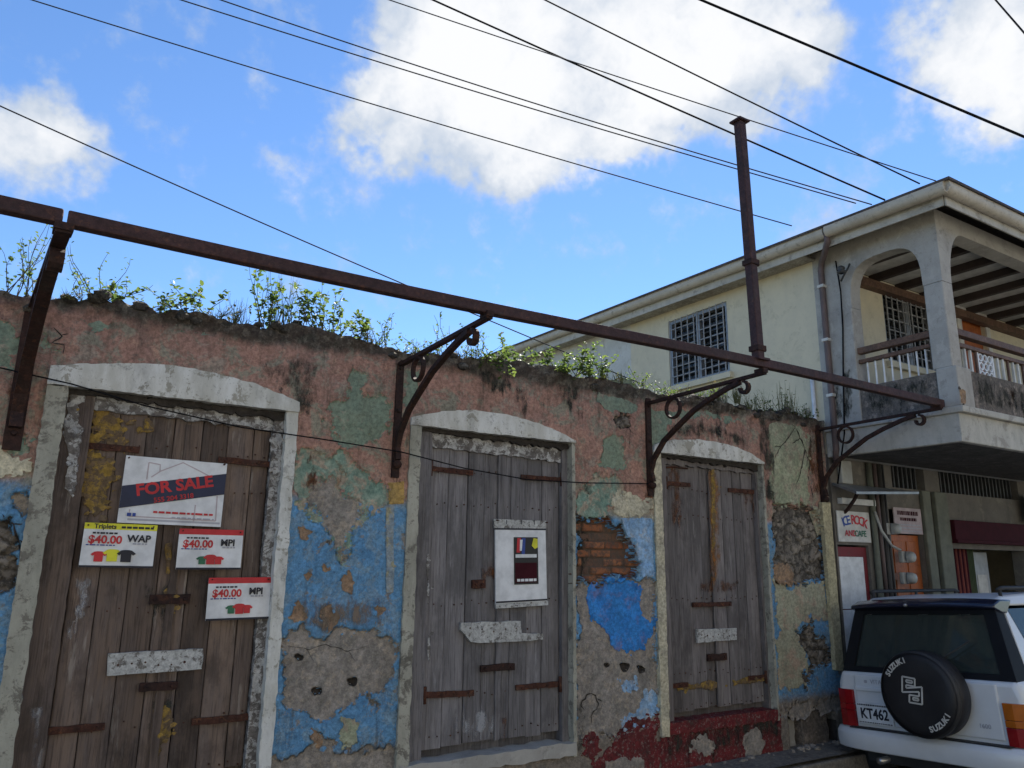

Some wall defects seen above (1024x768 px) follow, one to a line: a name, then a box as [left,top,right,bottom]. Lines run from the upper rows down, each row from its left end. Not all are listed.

water stain [482,372,527,417]
water stain [978,380,1024,415]
peeling [62,394,154,522]
peeling [269,365,420,595]
flaking render [0,488,29,593]
flaking render [568,374,663,768]
flaking render [770,498,825,587]
flaking render [271,600,400,768]
flaking render [775,615,841,722]
peeling [689,733,716,757]
peeling [743,727,765,757]